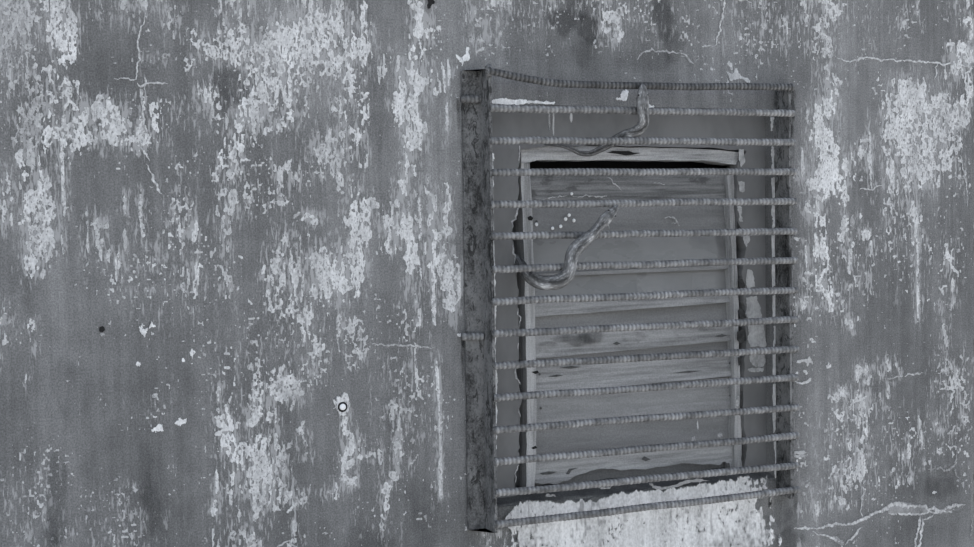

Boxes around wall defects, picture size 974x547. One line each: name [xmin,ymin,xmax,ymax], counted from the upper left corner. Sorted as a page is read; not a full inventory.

peeling [0,0,661,547]
flaking render [745,146,776,478]
peeling [676,0,974,329]
crack [838,56,974,79]
peeling [794,323,973,544]
crack [794,488,973,547]
crack [933,445,961,480]